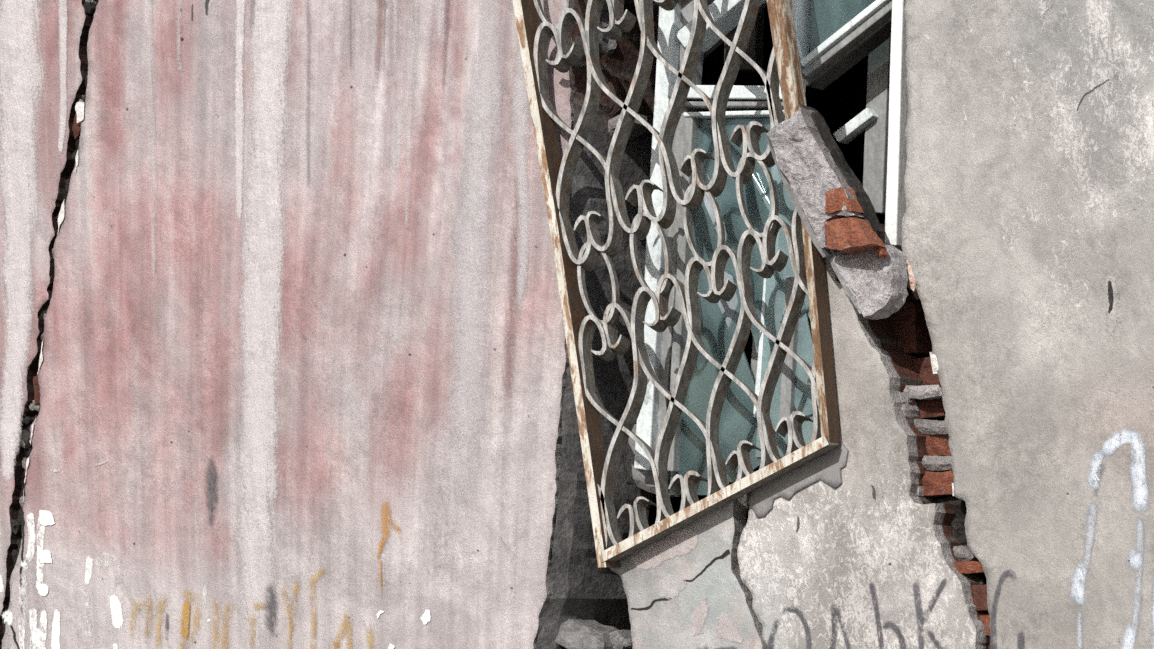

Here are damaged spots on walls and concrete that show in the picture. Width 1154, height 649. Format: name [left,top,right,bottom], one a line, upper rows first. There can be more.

crack [84,0,99,21]
crack [51,58,88,259]
crack [0,288,53,649]
crack [631,549,730,610]